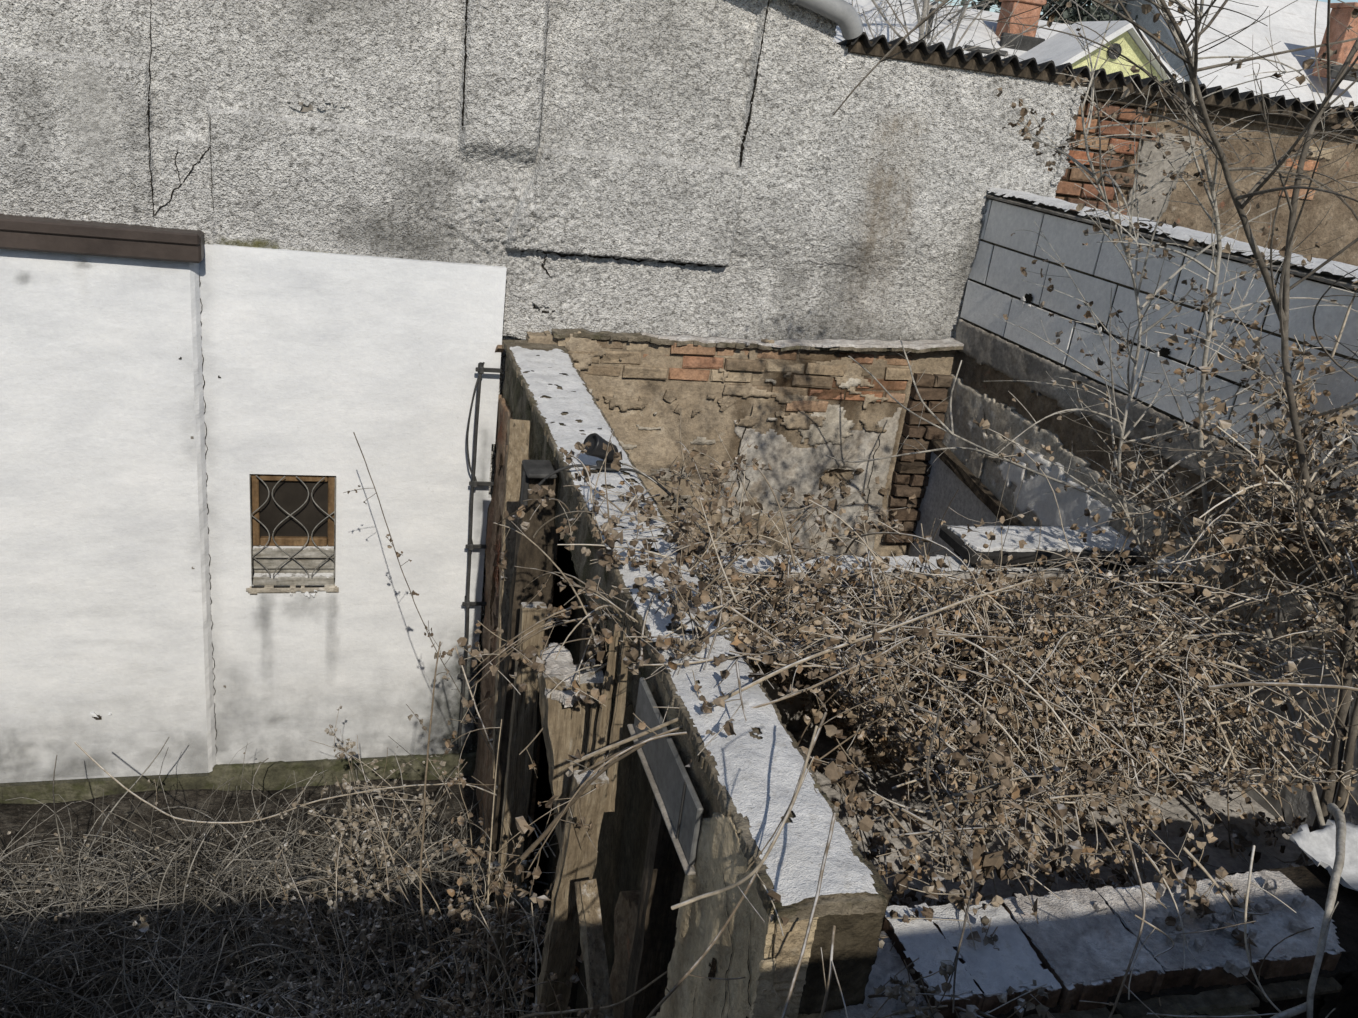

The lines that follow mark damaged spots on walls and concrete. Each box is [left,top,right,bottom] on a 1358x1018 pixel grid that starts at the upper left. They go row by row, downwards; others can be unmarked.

crack [147,0,214,217]
crack [739,0,770,167]
spalling [1050,86,1160,215]
crack [514,246,726,278]
spalling [557,331,916,557]
spalling [953,352,1358,642]
spalling [704,576,1202,629]
crack [693,875,752,1018]